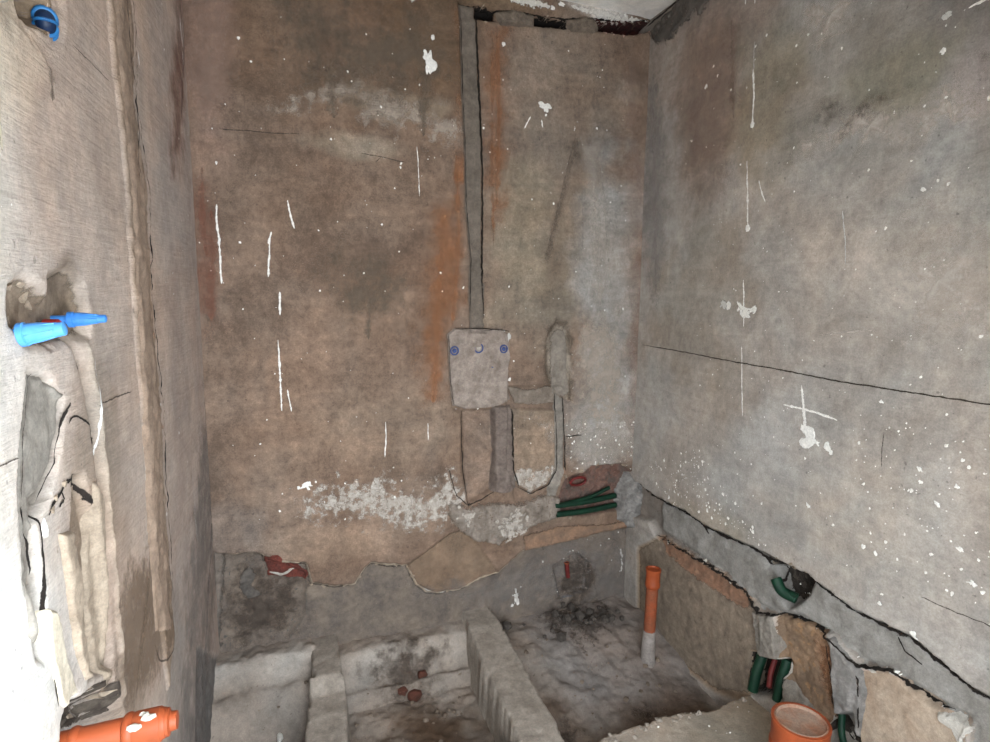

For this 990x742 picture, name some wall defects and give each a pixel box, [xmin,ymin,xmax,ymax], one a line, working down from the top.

spalling [555,463,630,520]
spalling [219,528,626,652]
spalling [639,537,861,742]
crack [639,483,990,728]
spalling [60,680,121,728]
peeling [937,711,975,742]